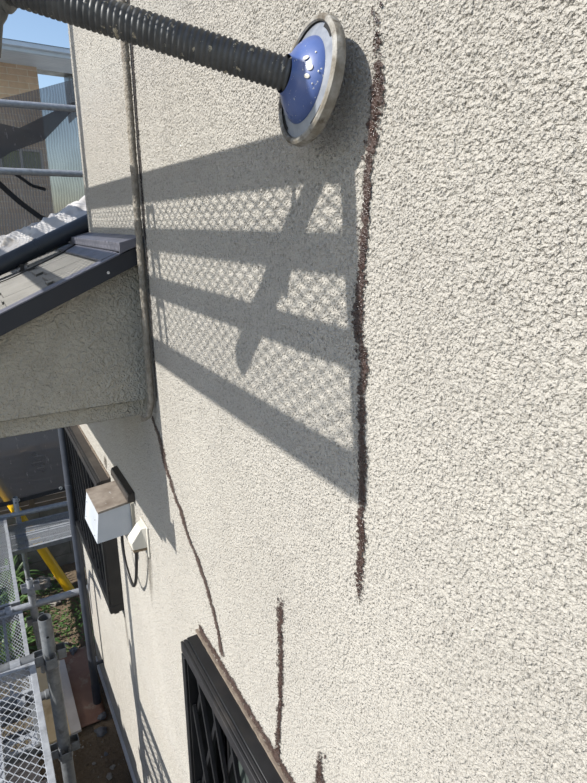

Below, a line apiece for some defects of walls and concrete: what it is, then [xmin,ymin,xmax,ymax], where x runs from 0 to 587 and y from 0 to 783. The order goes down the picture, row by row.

crack [350,2,385,604]
crack [151,415,224,657]
crack [274,592,285,756]
crack [312,741,326,783]